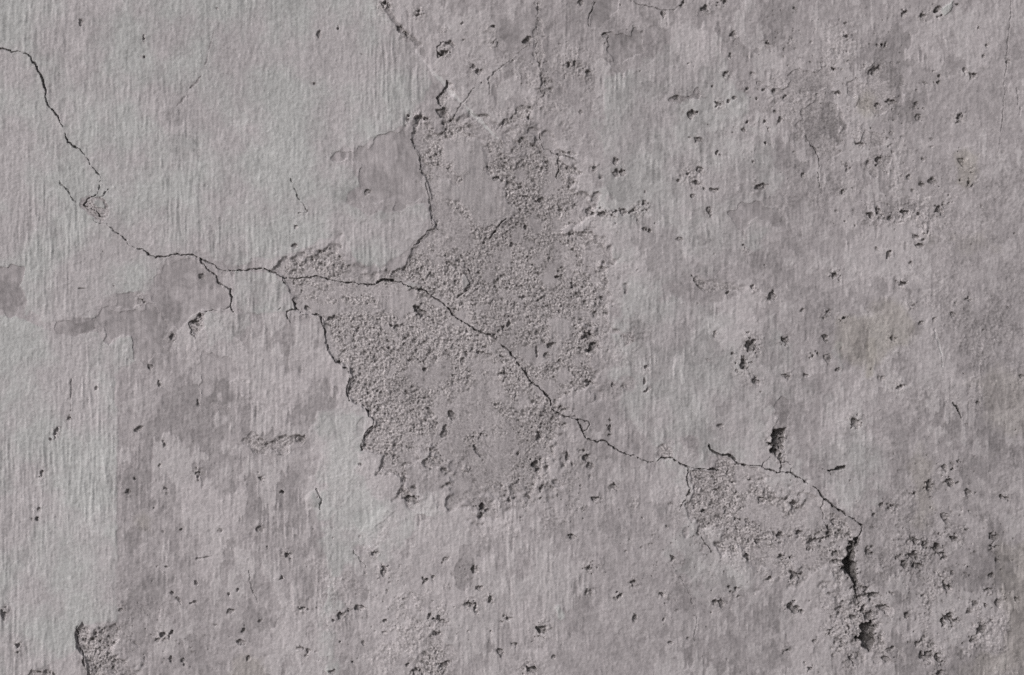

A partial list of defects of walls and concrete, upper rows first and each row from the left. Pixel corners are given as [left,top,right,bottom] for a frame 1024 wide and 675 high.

crack [0,43,864,617]
flaking render [270,0,652,542]
flaking render [682,396,1021,675]